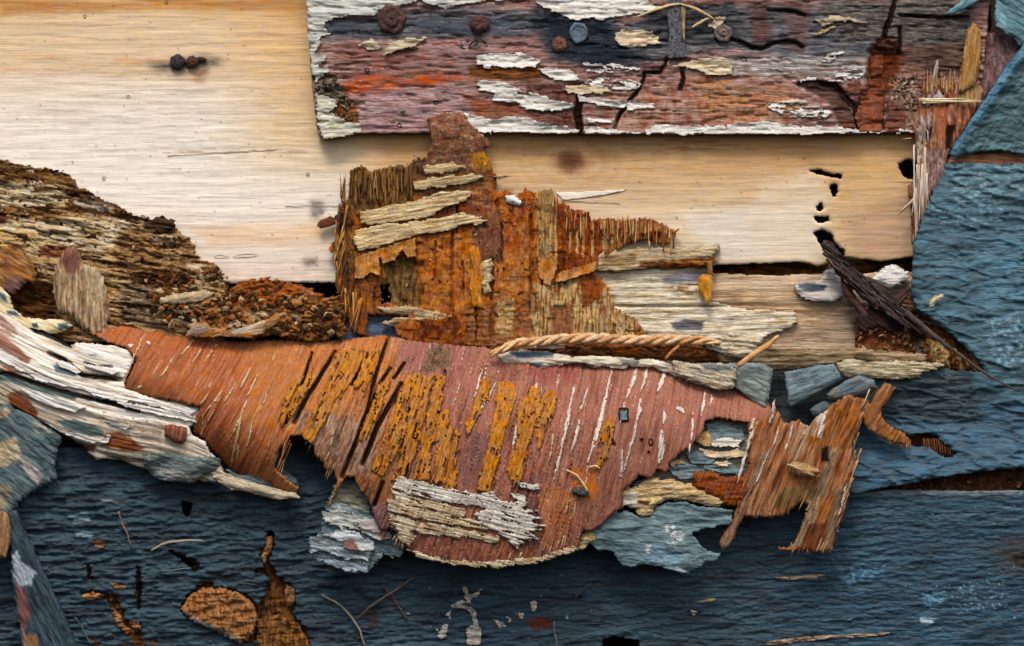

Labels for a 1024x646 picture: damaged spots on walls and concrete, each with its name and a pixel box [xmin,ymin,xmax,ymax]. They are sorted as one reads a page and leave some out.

peeling [535,0,661,21]
peeling [615,29,661,48]
peeling [708,16,726,29]
peeling [813,15,868,35]
peeling [946,0,980,16]
peeling [306,0,503,139]
crack [574,94,584,135]
crack [614,60,685,129]
peeling [464,36,914,136]
peeling [0,338,275,465]
peeling [278,345,826,575]